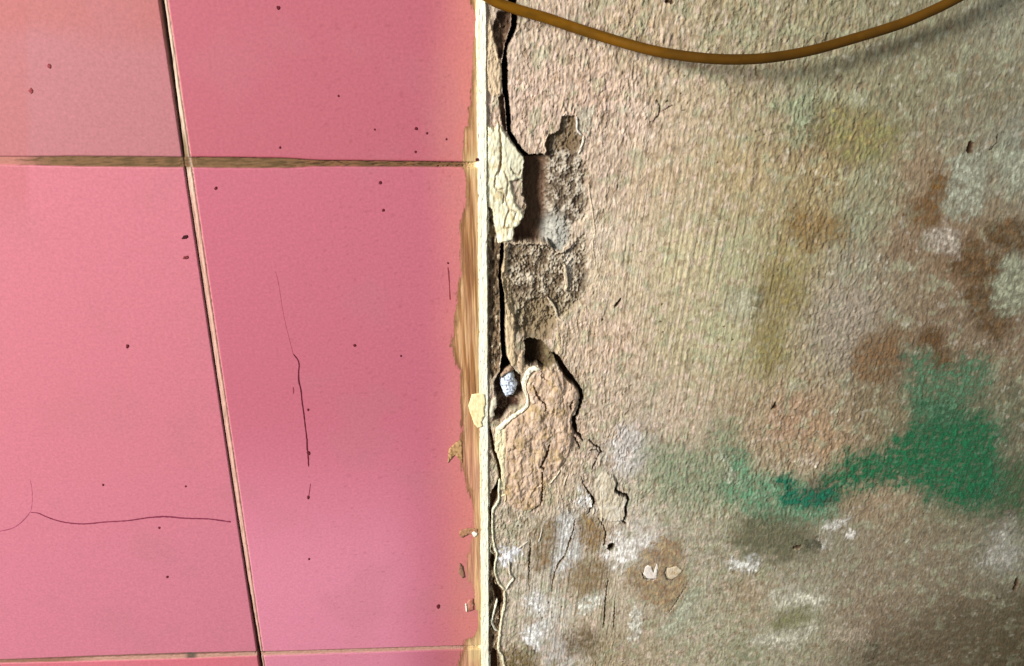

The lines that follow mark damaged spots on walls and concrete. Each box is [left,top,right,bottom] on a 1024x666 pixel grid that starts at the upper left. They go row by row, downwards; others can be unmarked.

crack [492,0,545,158]
crack [0,481,240,532]
crack [275,272,311,496]
crack [487,206,512,380]
spalling [468,113,596,428]
crack [488,351,608,666]
damp [649,348,1024,569]